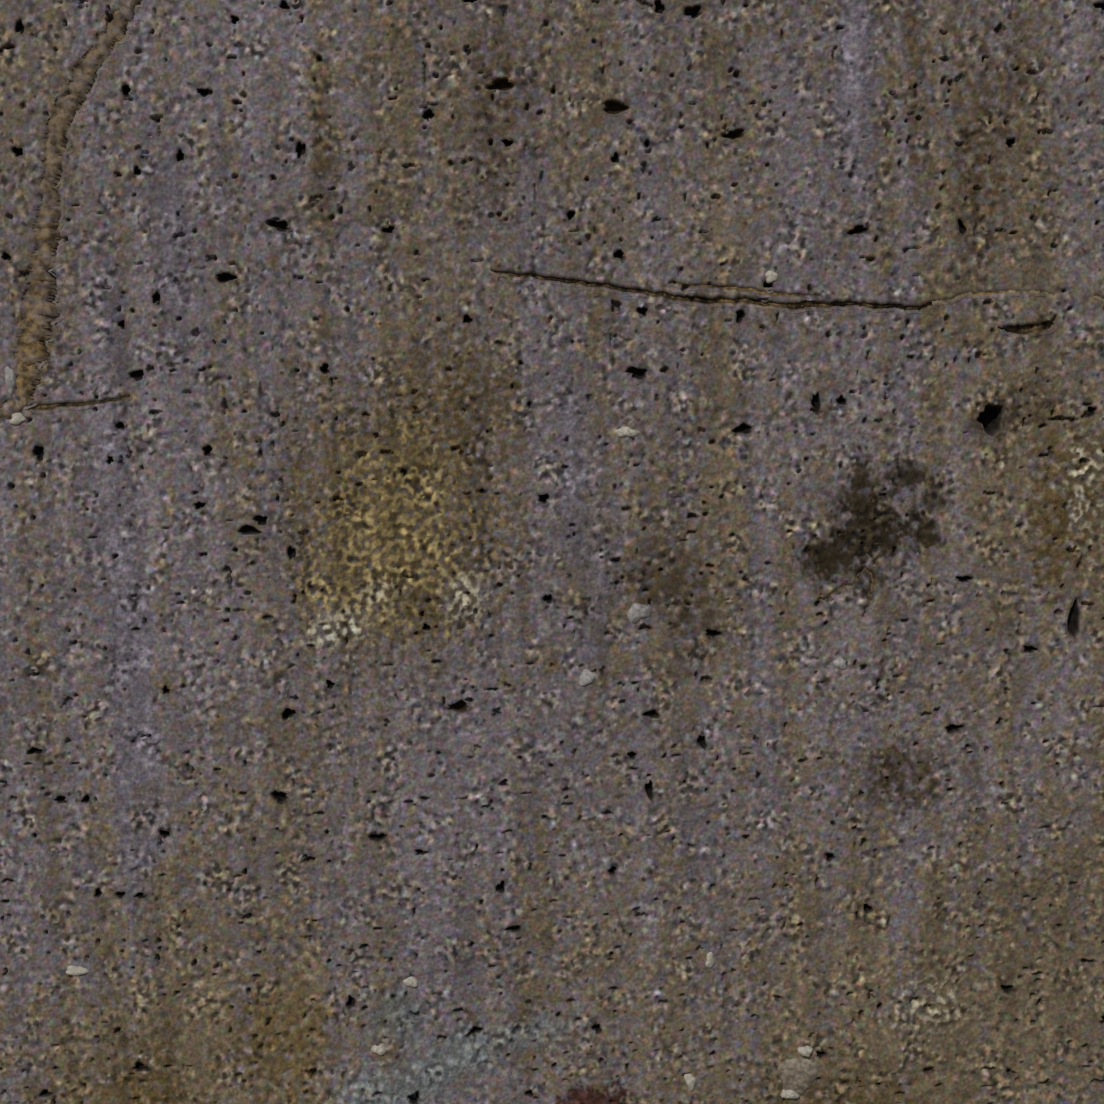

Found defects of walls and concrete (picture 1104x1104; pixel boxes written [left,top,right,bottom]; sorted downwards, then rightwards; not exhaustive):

crack [0,0,145,428]
crack [491,266,1059,338]
water stain [790,440,946,597]
corrosion [555,1079,633,1104]